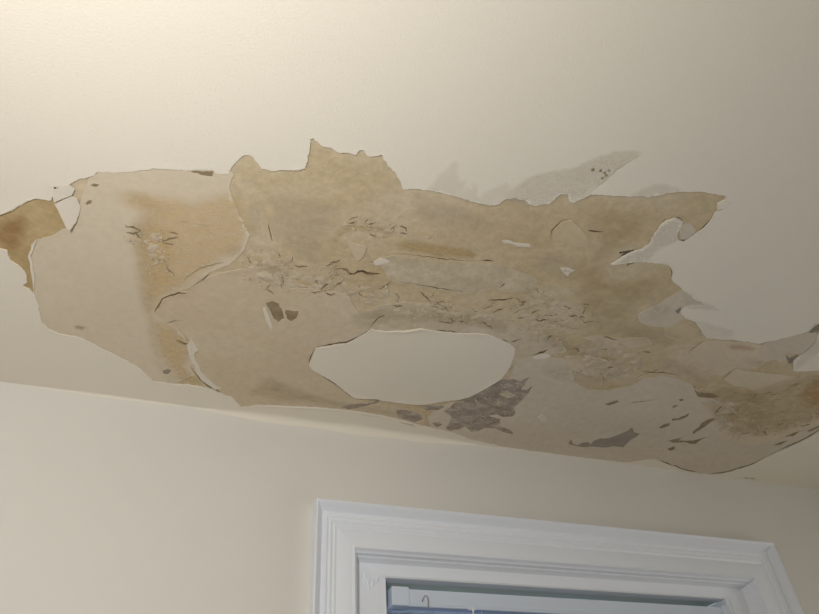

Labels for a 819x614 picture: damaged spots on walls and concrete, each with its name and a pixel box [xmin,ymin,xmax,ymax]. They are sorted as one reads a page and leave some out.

peeling [0,139,819,474]